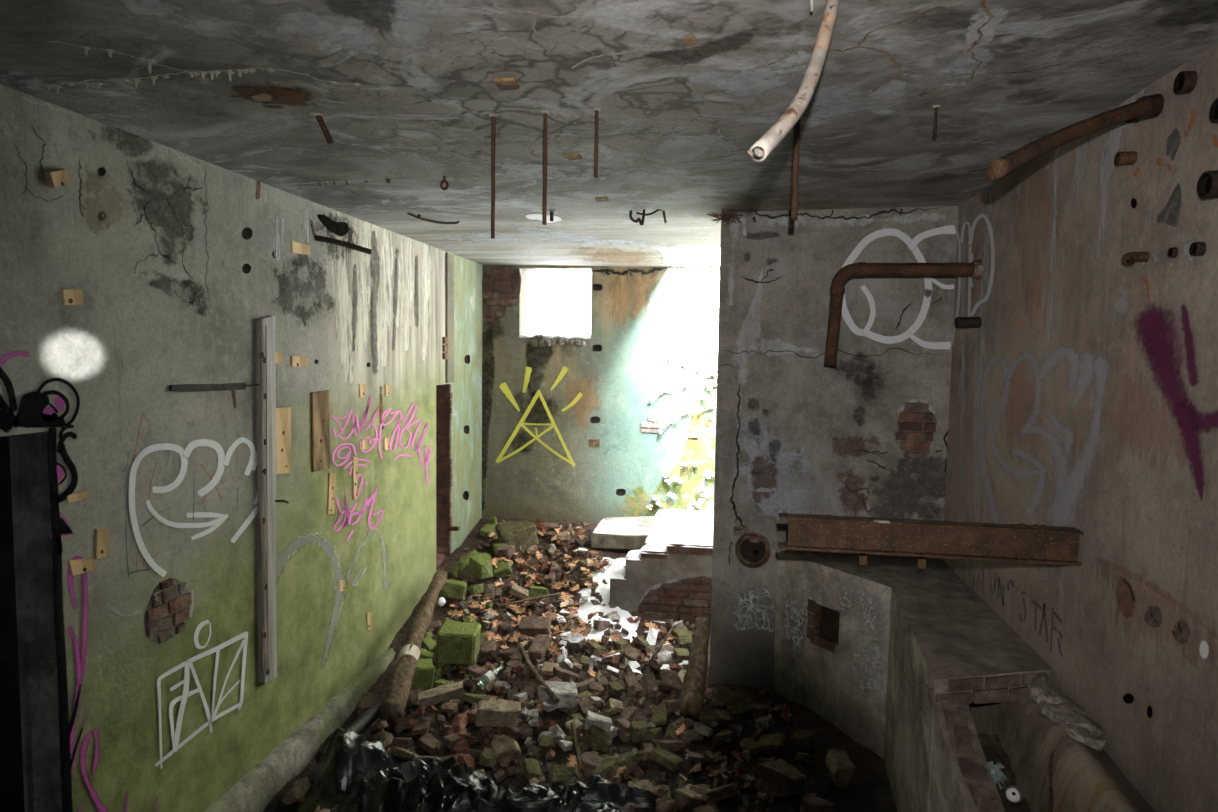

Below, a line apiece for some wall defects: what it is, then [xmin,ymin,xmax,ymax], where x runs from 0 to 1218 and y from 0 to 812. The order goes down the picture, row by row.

crack [474,0,646,69]
crack [762,0,1112,99]
crack [269,127,886,187]
water stain [93,127,207,316]
water stain [446,226,679,249]
water stain [273,205,432,384]
flaking render [482,265,521,322]
peeling [734,413,867,533]
crack [720,297,945,565]
flaking render [893,398,937,459]
crack [936,401,950,499]
flaking render [107,578,195,644]